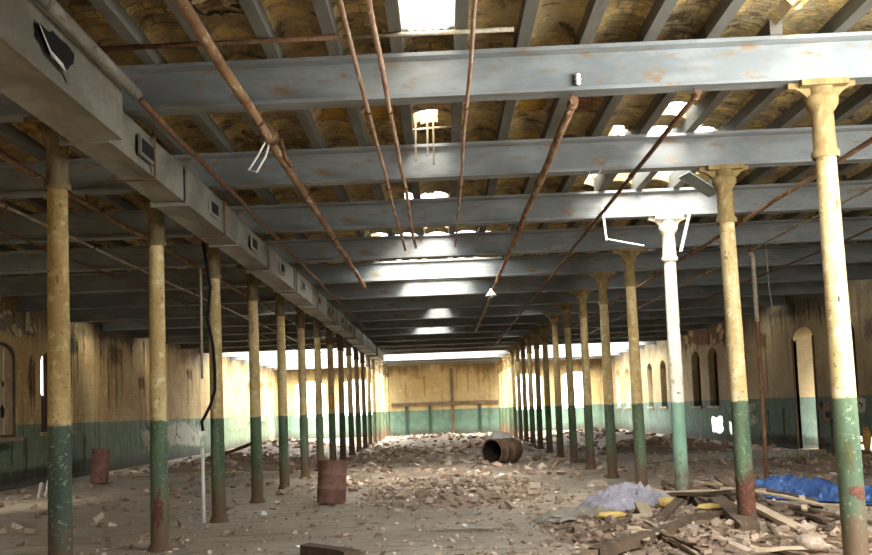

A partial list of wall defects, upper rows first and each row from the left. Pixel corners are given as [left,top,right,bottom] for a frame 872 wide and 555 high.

spalling [189,0,245,16]
flaking render [681,323,726,354]
peeling [167,416,210,449]
rust [737,471,756,516]